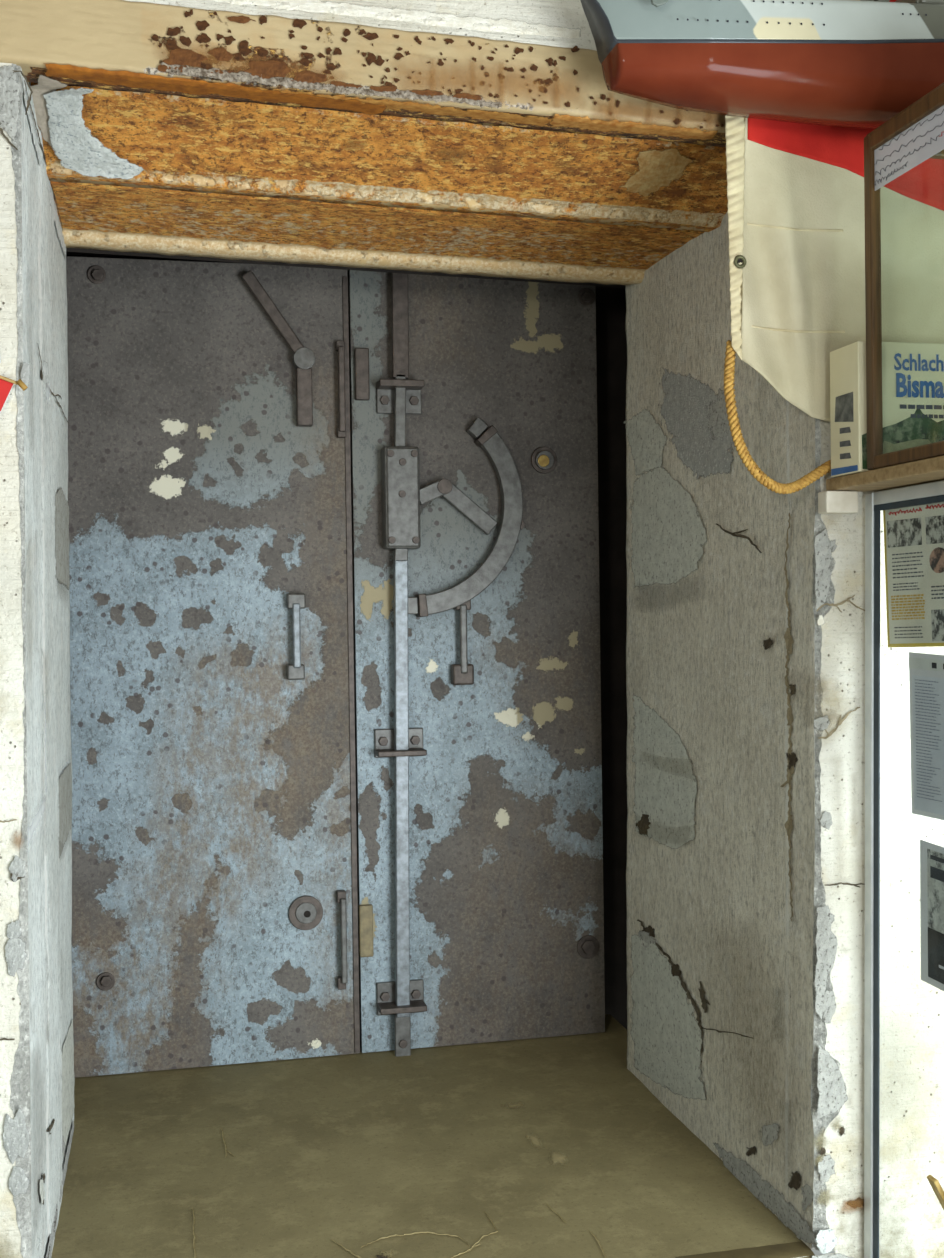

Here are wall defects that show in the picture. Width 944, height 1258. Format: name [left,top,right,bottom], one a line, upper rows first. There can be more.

corrosion [45,9,724,196]
crack [38,346,69,425]
spalling [3,63,74,1258]
spalling [714,418,852,1258]
spalling [630,926,706,1100]
crack [637,919,752,1062]